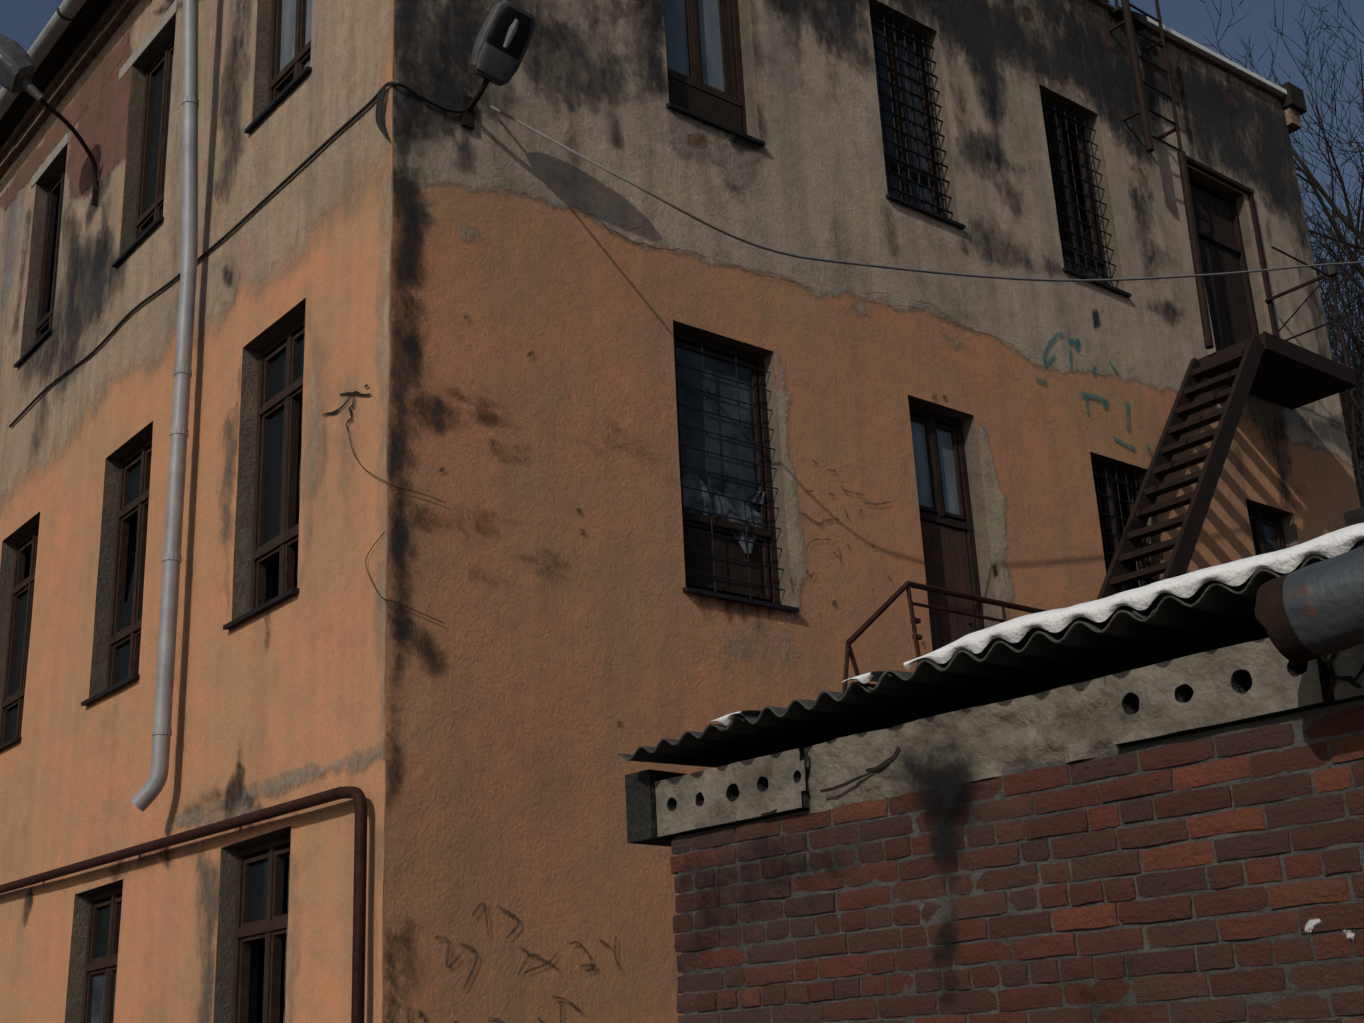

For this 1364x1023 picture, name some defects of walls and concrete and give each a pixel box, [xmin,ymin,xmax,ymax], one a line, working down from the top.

damp [216,0,250,188]
damp [393,0,507,140]
damp [507,0,621,105]
damp [768,0,874,65]
damp [900,0,1309,250]
damp [25,205,124,388]
peeling [0,0,1332,715]
damp [1155,300,1177,322]
damp [222,413,239,538]
peeling [1242,393,1353,467]
damp [393,619,443,672]